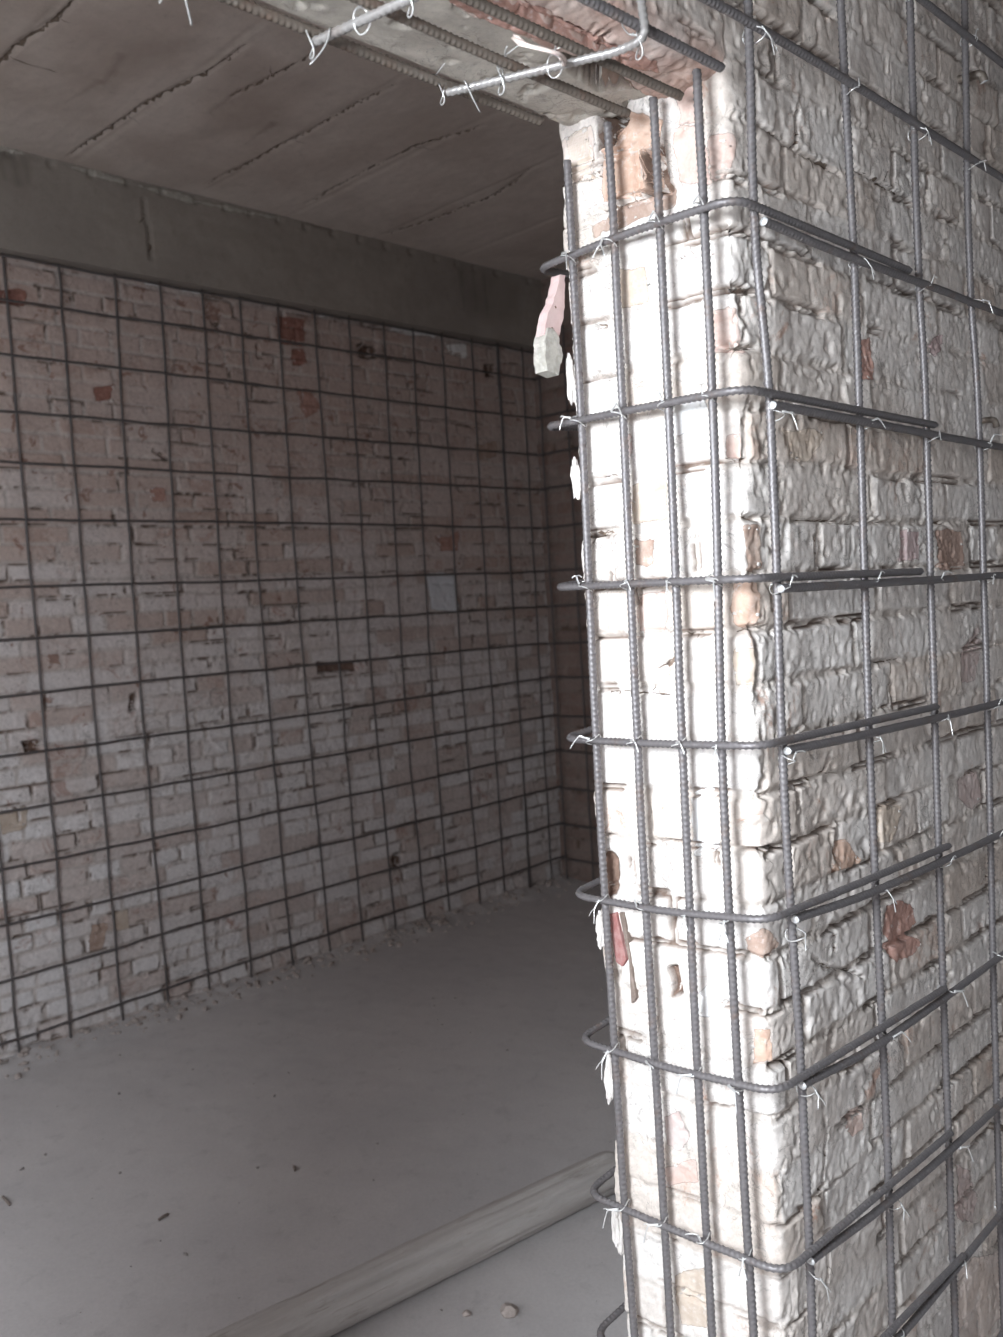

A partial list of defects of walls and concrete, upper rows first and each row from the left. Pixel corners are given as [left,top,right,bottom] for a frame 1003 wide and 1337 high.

crack [0,0,73,72]
spalling [449,0,659,73]
crack [71,44,313,154]
spalling [0,253,612,1053]
spalling [562,0,1003,1337]